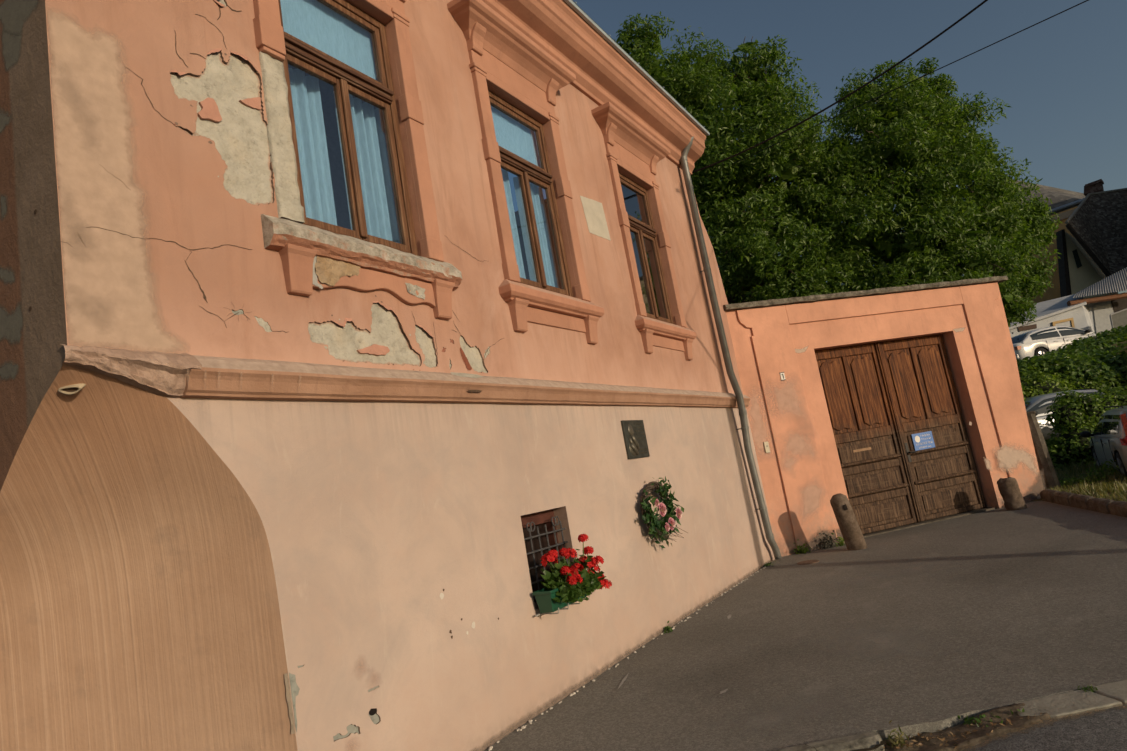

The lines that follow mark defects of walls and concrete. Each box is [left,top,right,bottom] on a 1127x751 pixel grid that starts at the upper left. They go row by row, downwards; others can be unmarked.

peeling [170,48,305,224]
crack [65,227,253,328]
flaking render [313,256,361,289]
flaking render [405,283,425,300]
peeling [308,295,503,392]
flaking render [333,708,381,742]